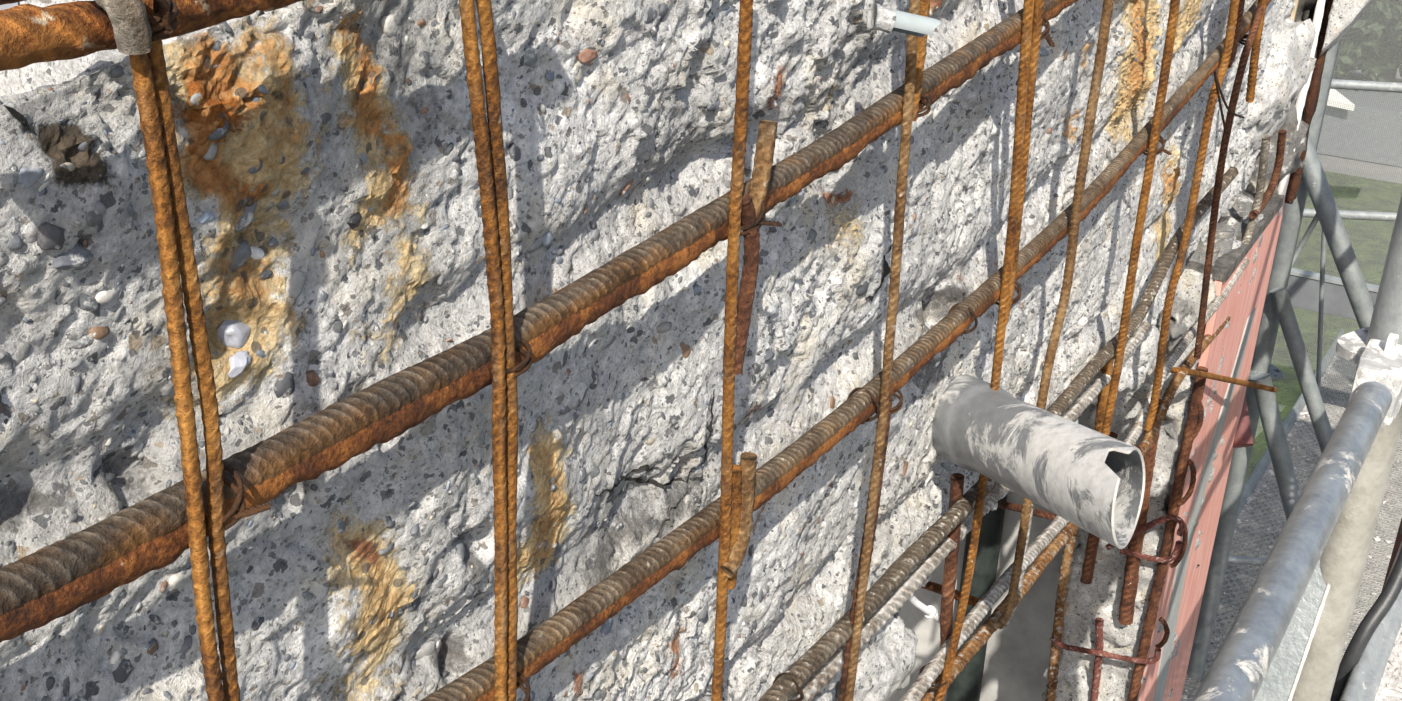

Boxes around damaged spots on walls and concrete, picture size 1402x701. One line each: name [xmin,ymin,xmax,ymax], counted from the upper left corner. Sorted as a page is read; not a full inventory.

spalling [375,11,436,42]
rust [1105,0,1202,143]
spalling [52,174,137,404]
rust [163,11,433,415]
spalling [220,197,420,361]
rust [1152,127,1183,265]
spalling [0,342,51,446]
spalling [0,474,63,531]
spalling [269,367,309,406]
rust [517,415,577,591]
crack [595,389,715,497]
rust [319,511,420,701]